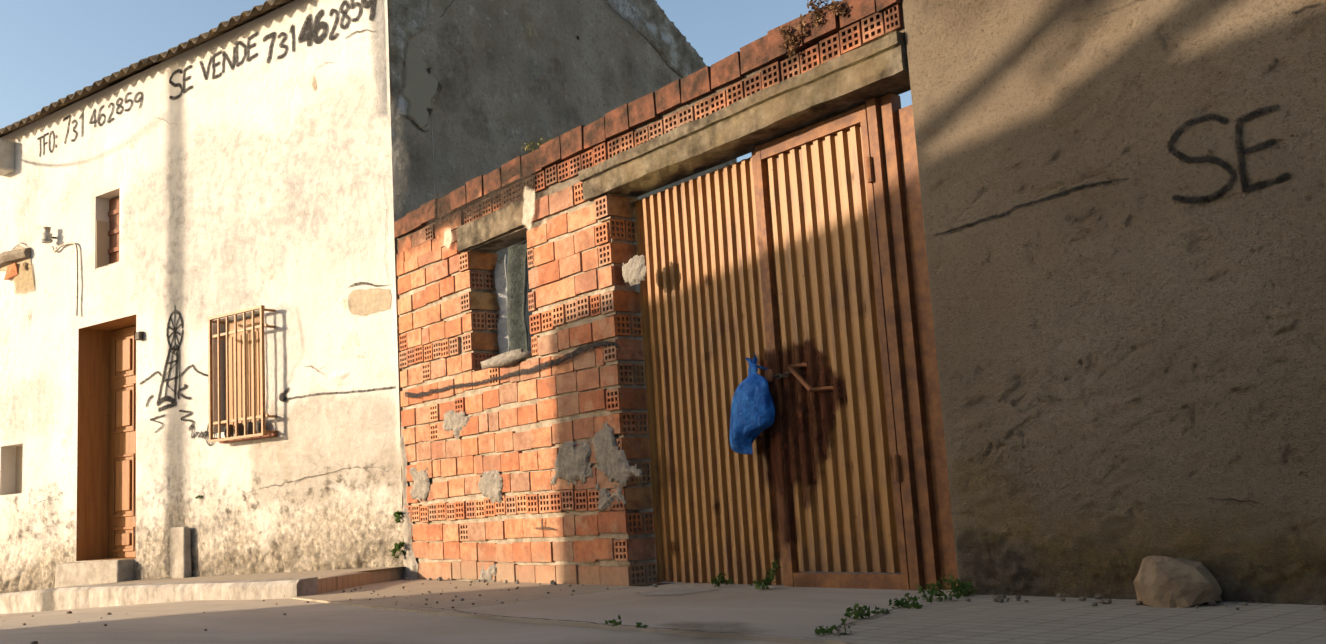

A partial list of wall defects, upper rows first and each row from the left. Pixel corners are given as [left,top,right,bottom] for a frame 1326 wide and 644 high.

peeling [606,0,706,78]
peeling [388,0,442,154]
spalling [0,242,34,293]
peeling [344,282,392,316]
damp [956,533,1139,600]
damp [1201,548,1326,605]